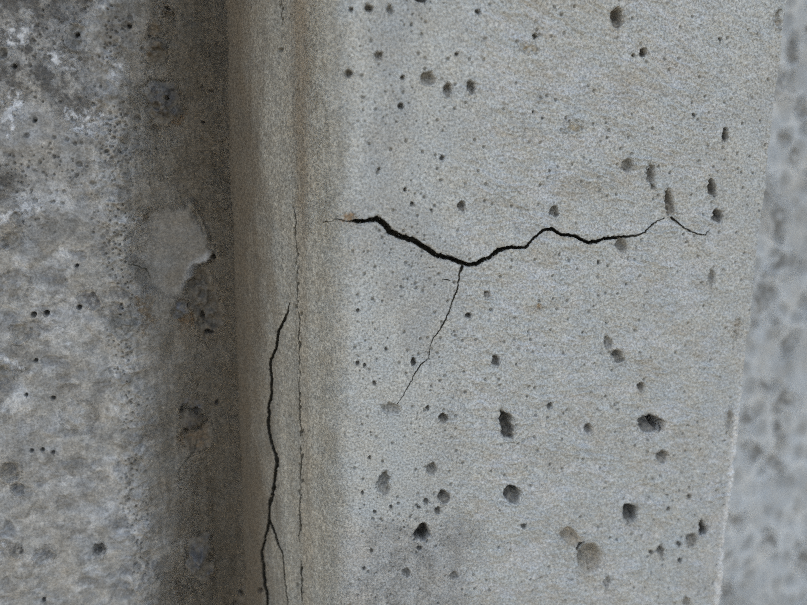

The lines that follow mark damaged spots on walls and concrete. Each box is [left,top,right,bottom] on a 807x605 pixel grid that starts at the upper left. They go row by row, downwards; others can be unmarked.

crack [260,208,303,605]
crack [325,216,710,404]